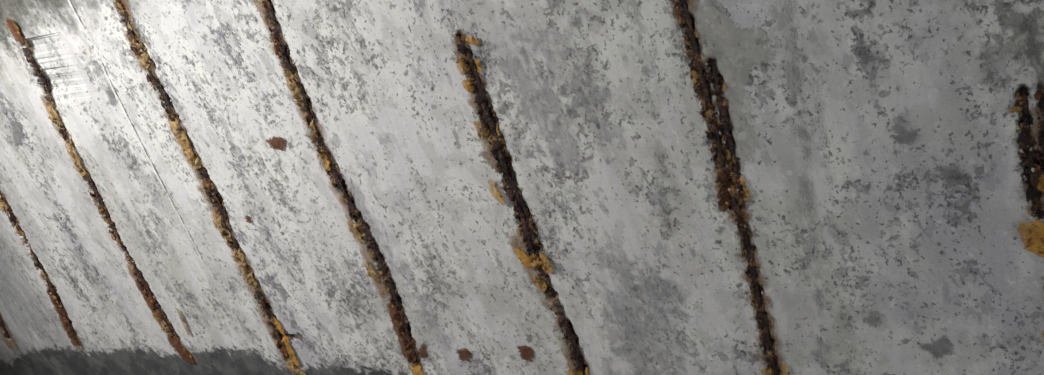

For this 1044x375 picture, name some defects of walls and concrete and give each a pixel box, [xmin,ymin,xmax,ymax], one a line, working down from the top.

rust [4,19,32,49]
rust [0,191,83,350]
rust [41,96,197,364]
rust [115,0,306,375]
rust [253,0,427,375]
rust [454,31,589,375]
rust [670,0,790,375]
rust [1010,83,1044,258]
spalling [1015,84,1044,220]